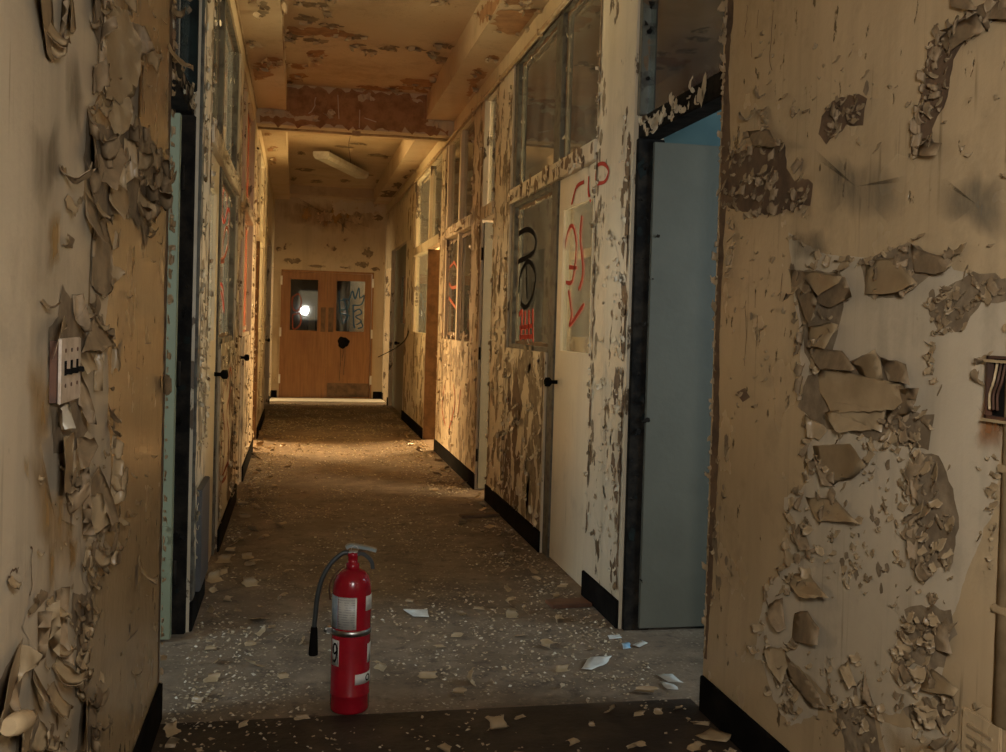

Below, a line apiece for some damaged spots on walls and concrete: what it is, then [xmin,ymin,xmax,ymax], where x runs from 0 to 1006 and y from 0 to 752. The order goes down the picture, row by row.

peeling [0,0,454,752]
peeling [403,0,707,590]
peeling [701,0,813,659]
peeling [817,43,874,145]
peeling [726,233,1006,752]
peeling [905,0,1006,160]